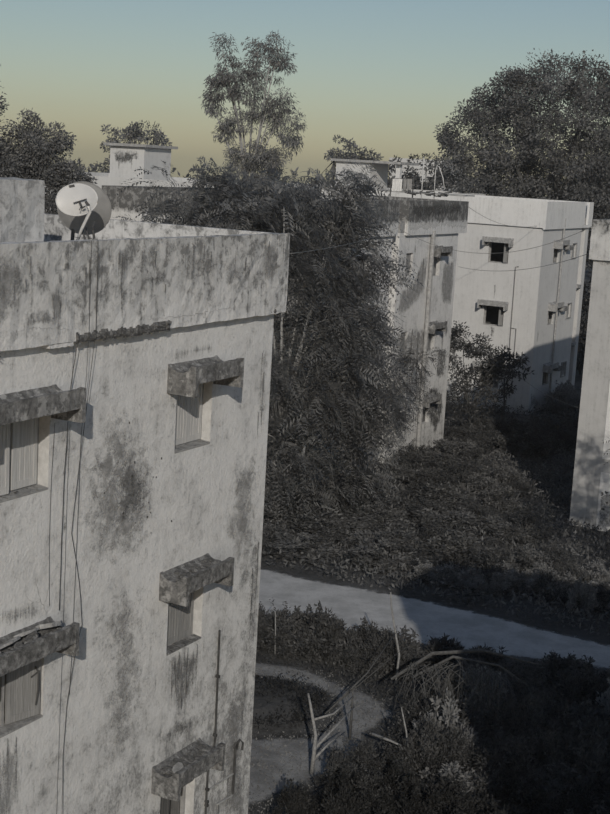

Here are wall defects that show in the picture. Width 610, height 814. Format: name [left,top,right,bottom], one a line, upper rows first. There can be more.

damp [118,250,128,304]
damp [28,295,61,323]
peeling [598,491,610,526]
damp [171,645,198,707]
damp [0,737,17,814]